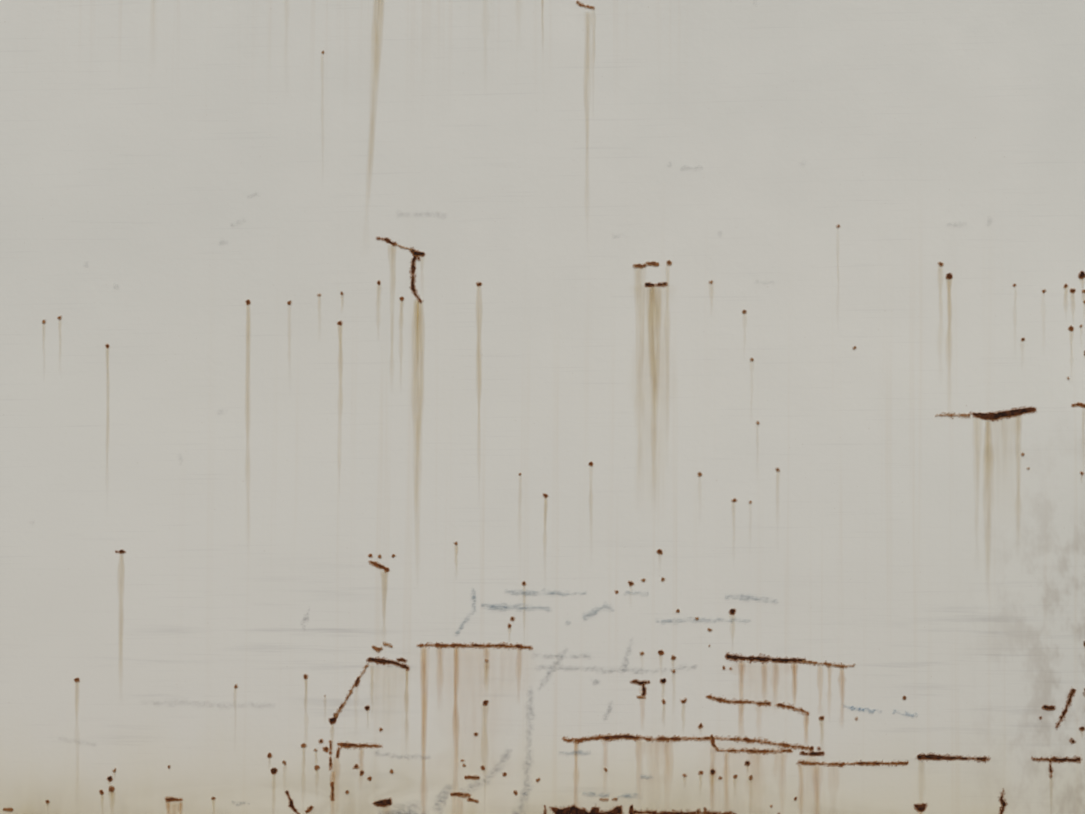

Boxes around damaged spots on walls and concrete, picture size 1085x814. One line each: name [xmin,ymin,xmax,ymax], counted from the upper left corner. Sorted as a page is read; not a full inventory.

corrosion [373,798,392,807]